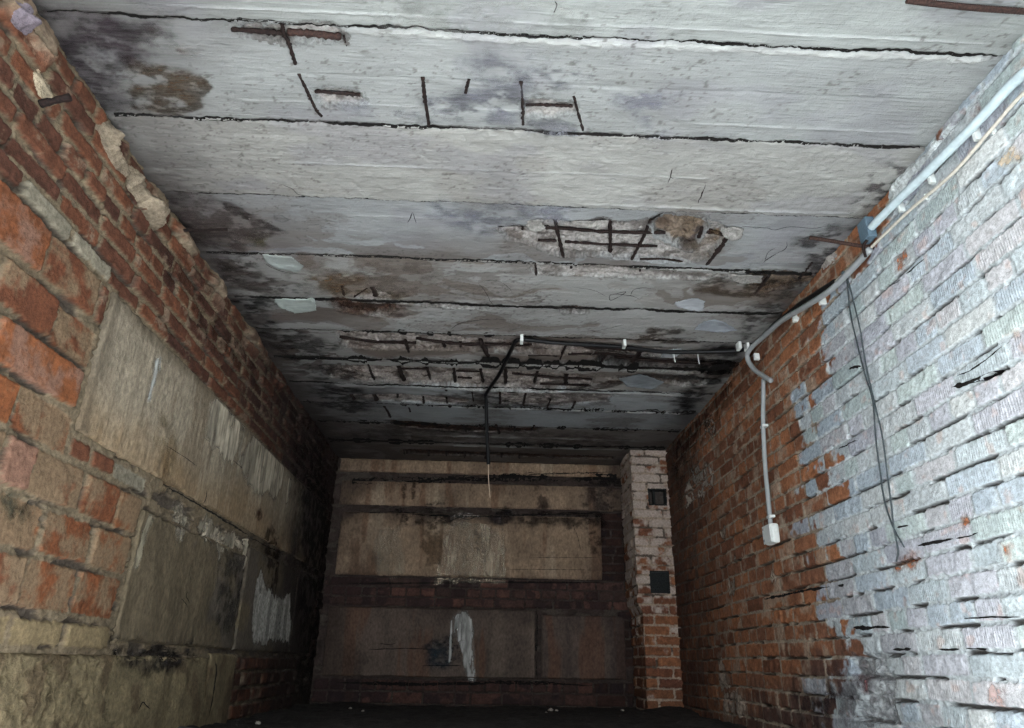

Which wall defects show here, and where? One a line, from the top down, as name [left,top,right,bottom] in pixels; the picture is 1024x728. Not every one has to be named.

crack [47,1,997,57]
water stain [58,17,212,115]
crack [114,112,920,149]
spalling [491,212,819,295]
water stain [171,197,364,380]
water stain [304,262,403,299]
water stain [637,328,698,344]
spalling [317,330,733,434]
crack [953,347,1005,388]
crack [897,525,977,546]
crack [964,613,1014,621]
crack [853,625,911,651]